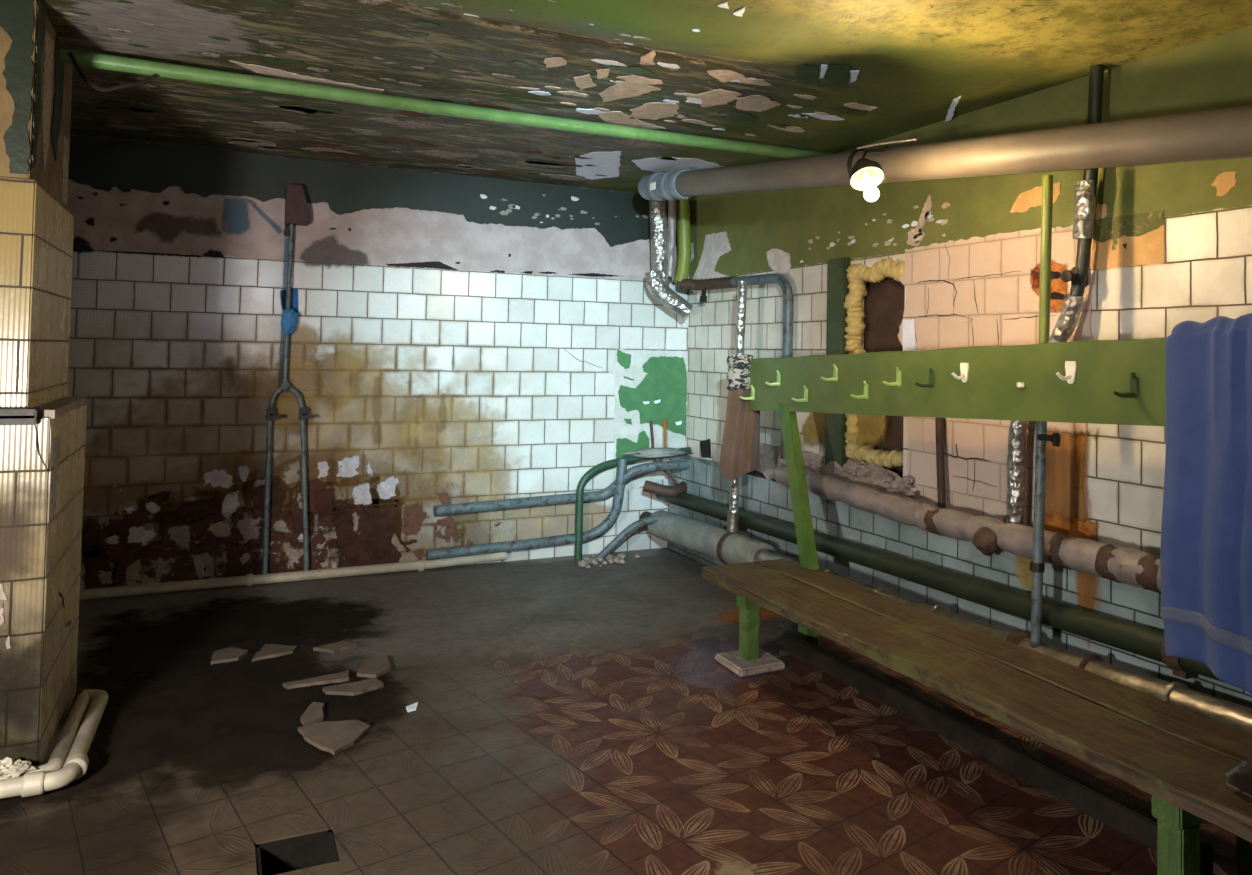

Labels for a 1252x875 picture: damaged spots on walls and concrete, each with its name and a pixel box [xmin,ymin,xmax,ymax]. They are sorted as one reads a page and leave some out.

peeling [0,0,878,247]
spalling [386,261,460,270]
peeling [666,199,731,280]
peeling [766,231,856,296]
peeling [865,195,951,247]
peeling [1010,182,1061,213]
peeling [1091,203,1165,270]
peeling [1211,171,1236,197]
spalling [81,455,474,589]
corrosion [1044,430,1122,611]
corrosion [1017,556,1033,590]